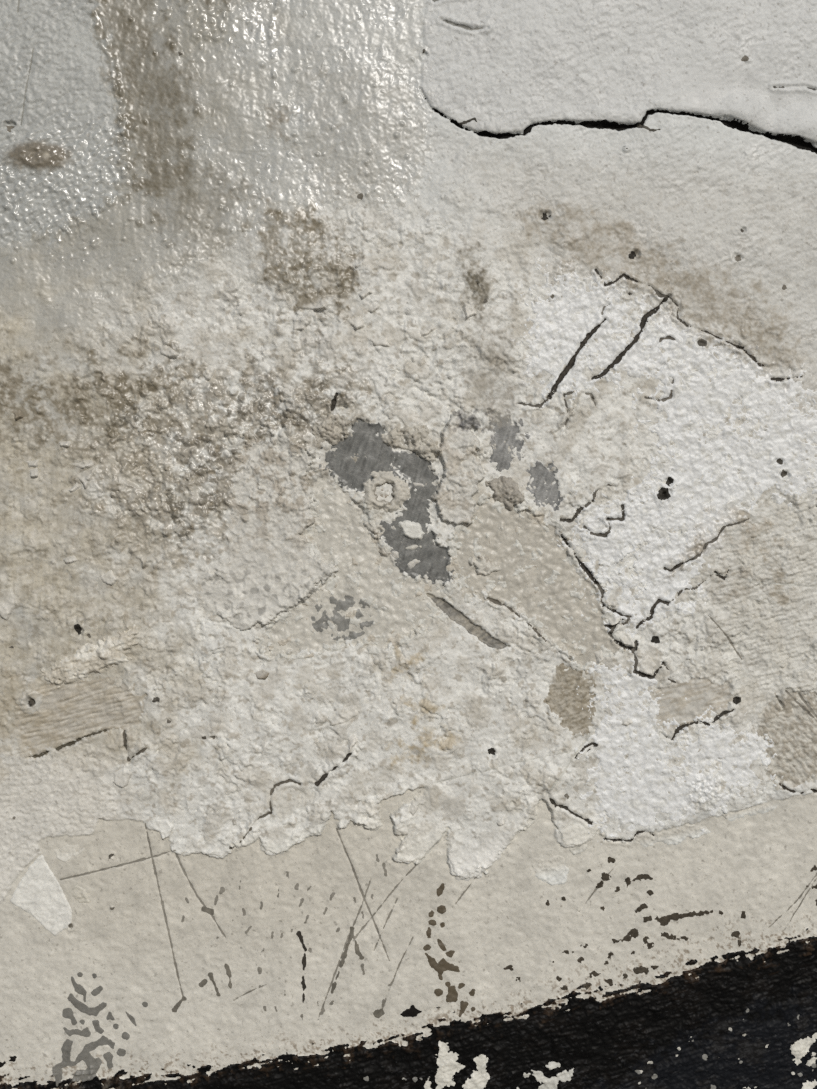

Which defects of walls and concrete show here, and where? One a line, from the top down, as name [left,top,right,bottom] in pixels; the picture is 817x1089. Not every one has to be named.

crack [425,98,817,154]
leakage [0,0,442,481]
peeling [347,287,390,347]
peeling [648,285,687,326]
crack [547,269,803,427]
peeling [67,460,96,493]
spalling [186,397,750,737]
crack [560,504,669,679]
crack [663,560,689,572]
crack [666,709,734,740]
crack [779,783,817,794]
peeling [0,687,817,1089]